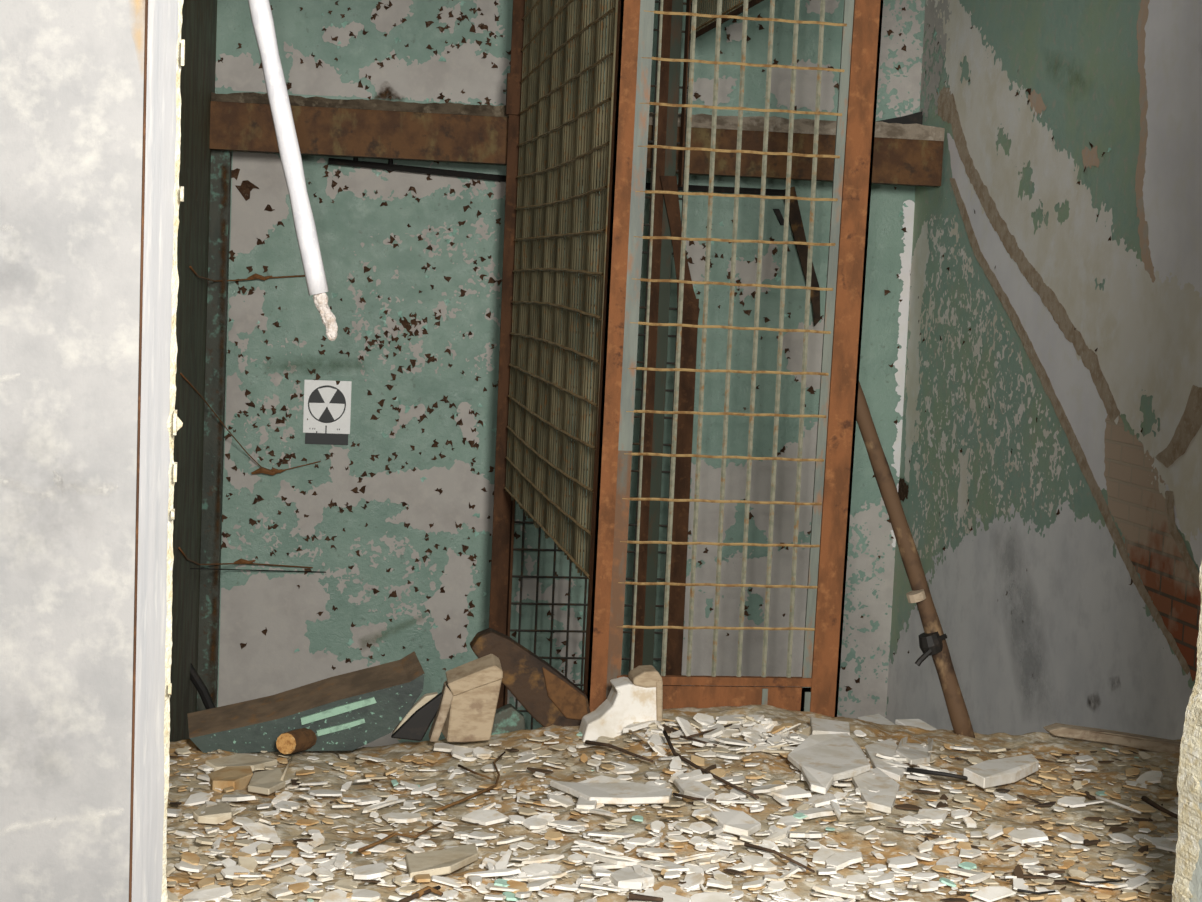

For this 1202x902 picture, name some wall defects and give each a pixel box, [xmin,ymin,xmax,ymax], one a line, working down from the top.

peeling [215,43,267,92]
peeling [284,0,511,105]
peeling [218,151,506,707]
peeling [876,0,1202,902]
peeling [512,516,586,684]
peeling [837,497,953,730]